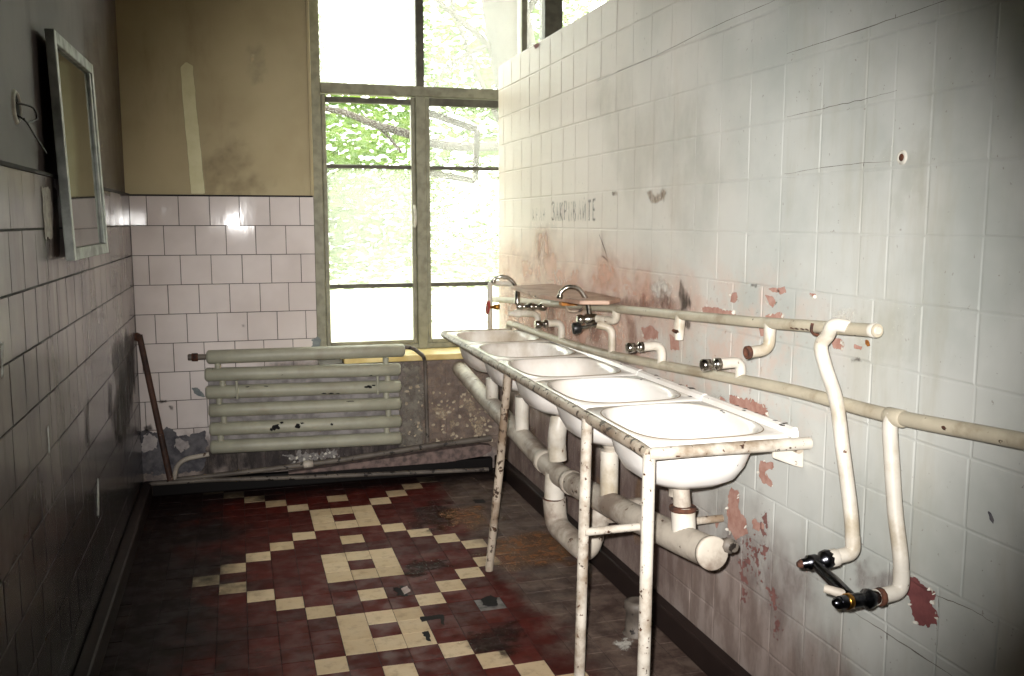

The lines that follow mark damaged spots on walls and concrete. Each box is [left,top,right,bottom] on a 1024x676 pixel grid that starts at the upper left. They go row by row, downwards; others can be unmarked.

crack [788,90,897,117]
crack [789,161,887,174]
peeling [701,292,738,315]
peeling [759,286,786,336]
peeling [641,325,679,350]
peeling [720,395,769,417]
spalling [140,427,209,476]
peeling [757,459,779,487]
peeling [715,487,764,540]
peeling [906,577,939,628]